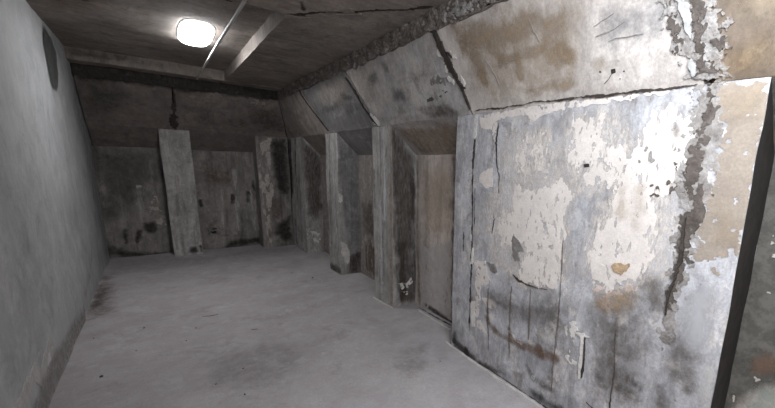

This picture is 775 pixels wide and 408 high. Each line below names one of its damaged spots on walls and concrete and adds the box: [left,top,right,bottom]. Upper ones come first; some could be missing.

crack [289,6,433,19]
crack [169,92,179,129]
crack [345,77,380,126]
damp [271,139,338,254]
damp [331,126,497,372]
crack [419,29,695,408]
peeling [474,0,768,351]
damp [528,370,562,408]
damp [564,321,589,379]
damp [597,316,639,392]